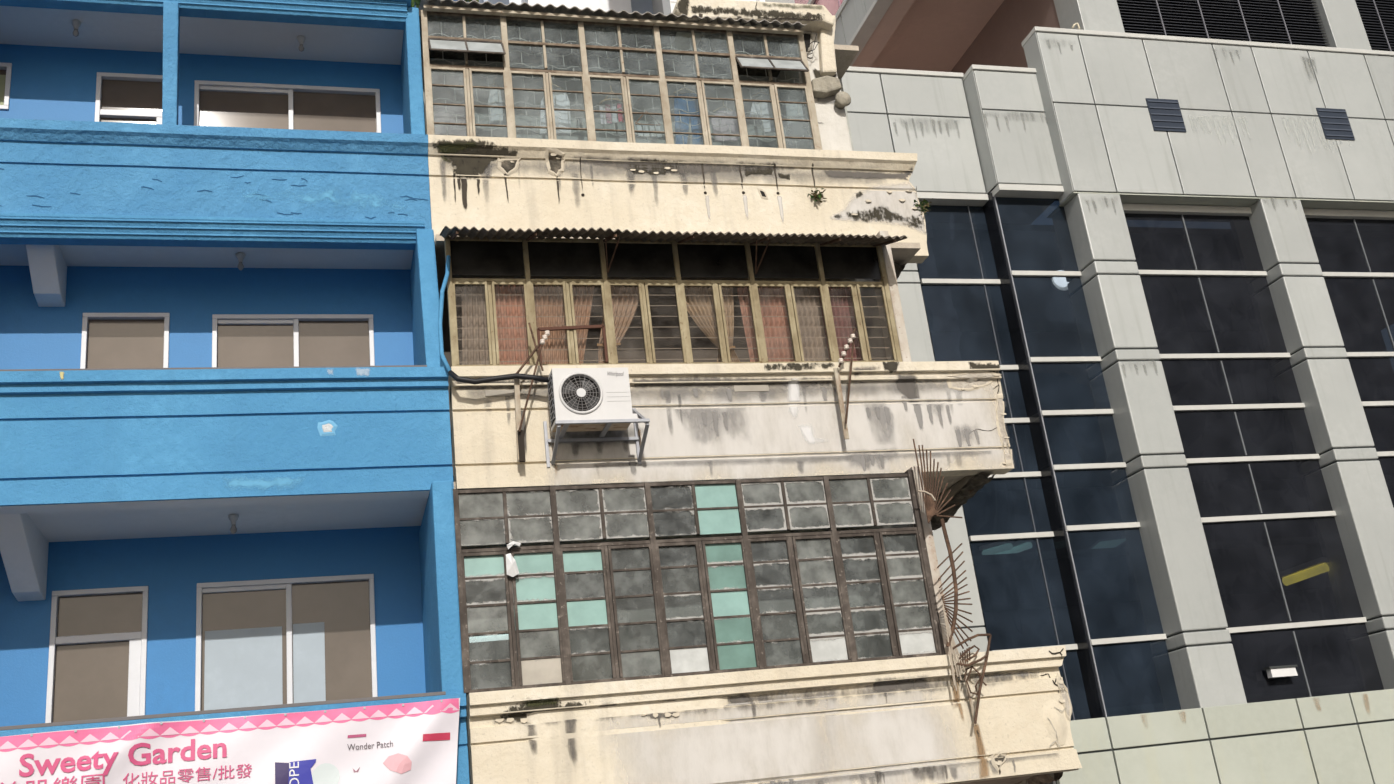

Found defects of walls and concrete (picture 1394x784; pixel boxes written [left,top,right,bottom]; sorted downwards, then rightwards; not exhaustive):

water stain [433,139,518,209]
water stain [564,157,790,220]
water stain [811,164,913,193]
peeling [833,184,924,231]
water stain [634,361,979,471]
water stain [495,699,617,760]
water stain [728,692,843,715]
water stain [975,672,1028,684]